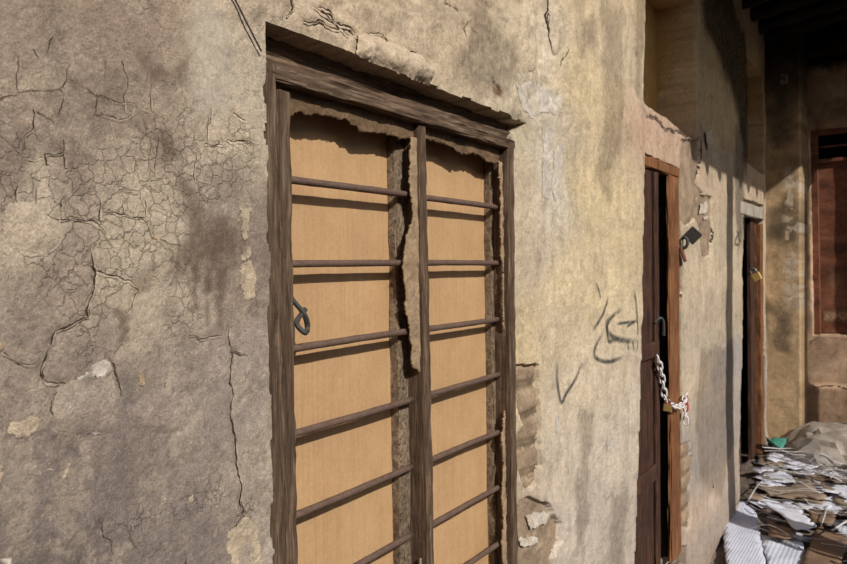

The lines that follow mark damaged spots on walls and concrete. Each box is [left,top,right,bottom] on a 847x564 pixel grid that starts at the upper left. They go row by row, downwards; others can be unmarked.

crack [287,0,388,53]
crack [545,0,569,65]
crack [0,37,154,168]
crack [147,136,159,170]
crack [193,105,252,183]
crack [644,109,730,251]
crack [1,186,184,433]
crack [189,328,248,526]
spalling [516,365,538,488]
flaking render [226,517,261,564]
spalling [517,498,557,564]